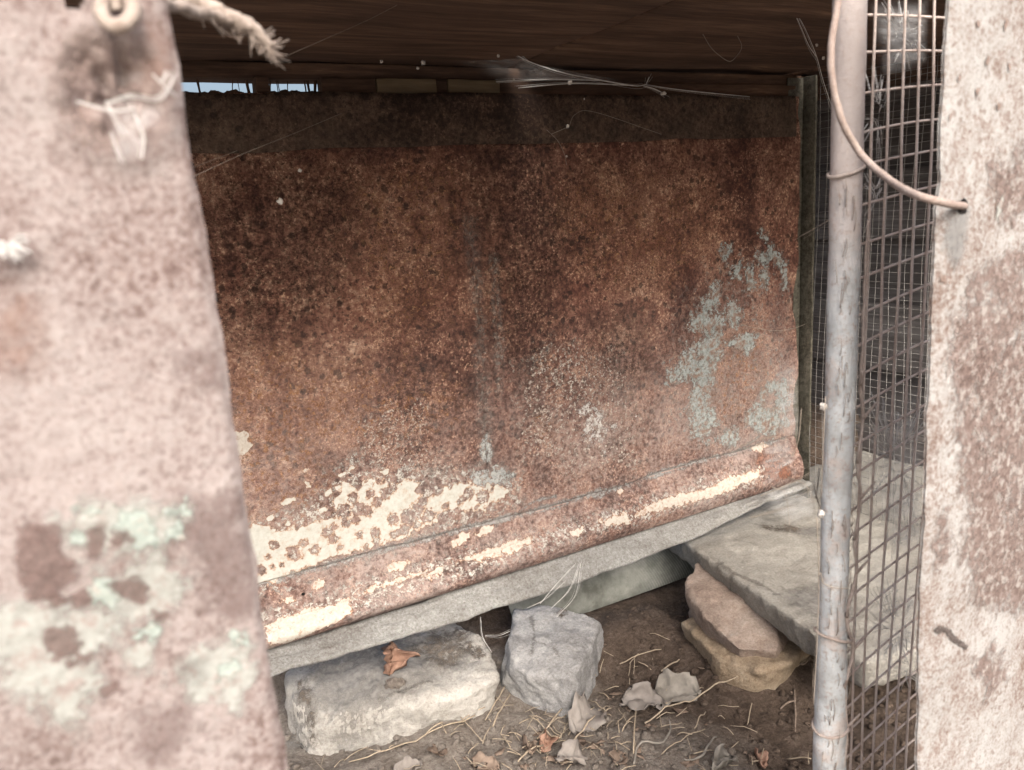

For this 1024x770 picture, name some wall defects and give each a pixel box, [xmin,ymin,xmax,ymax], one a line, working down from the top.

rust [231,354,448,519]
peeling [175,227,791,716]
rust [755,451,791,482]